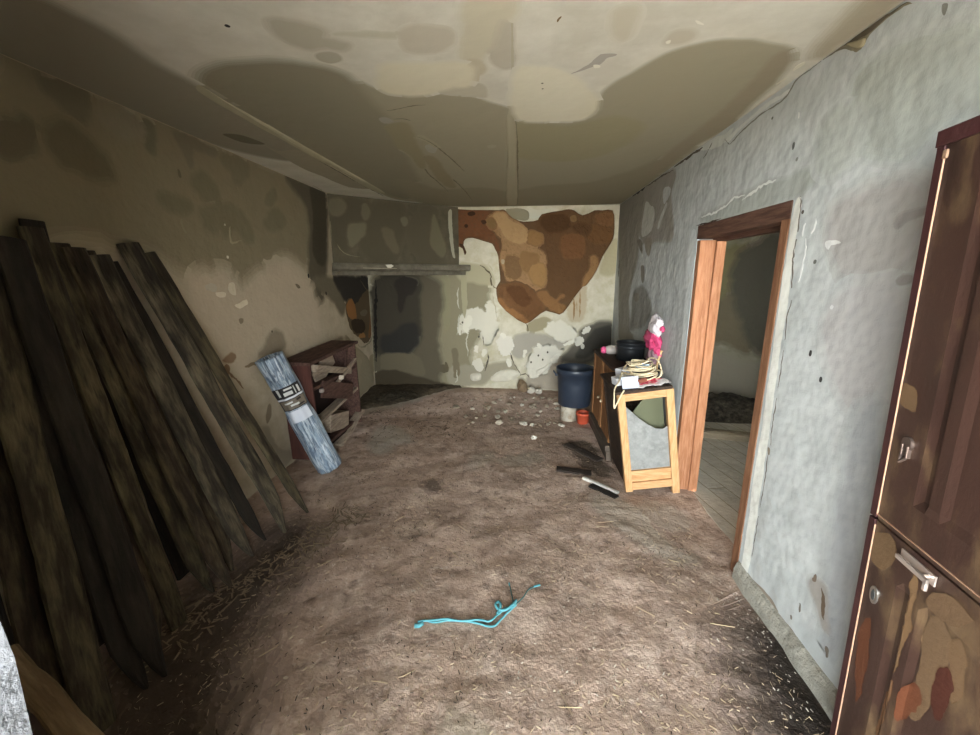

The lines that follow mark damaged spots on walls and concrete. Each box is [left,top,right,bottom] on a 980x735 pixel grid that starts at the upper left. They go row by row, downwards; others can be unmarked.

spalling [840,2,912,52]
leakage [0,0,905,391]
peeling [699,89,790,151]
spalling [448,208,615,380]